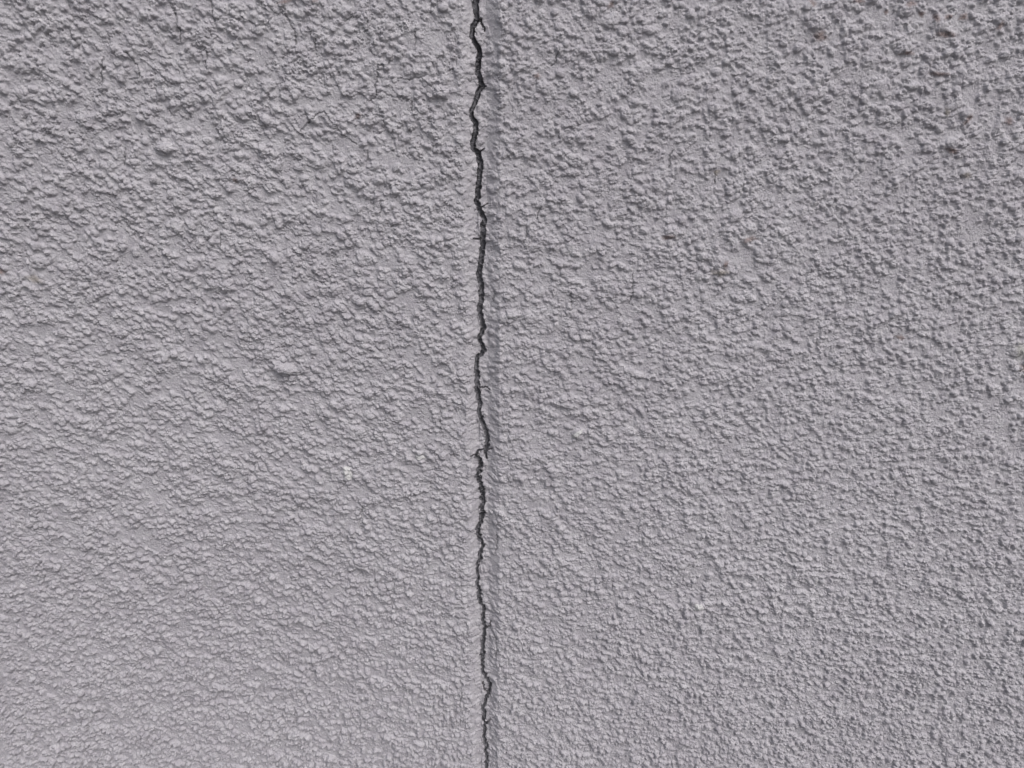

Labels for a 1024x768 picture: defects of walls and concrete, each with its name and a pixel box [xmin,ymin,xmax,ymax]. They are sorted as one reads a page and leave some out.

crack [459,0,498,768]